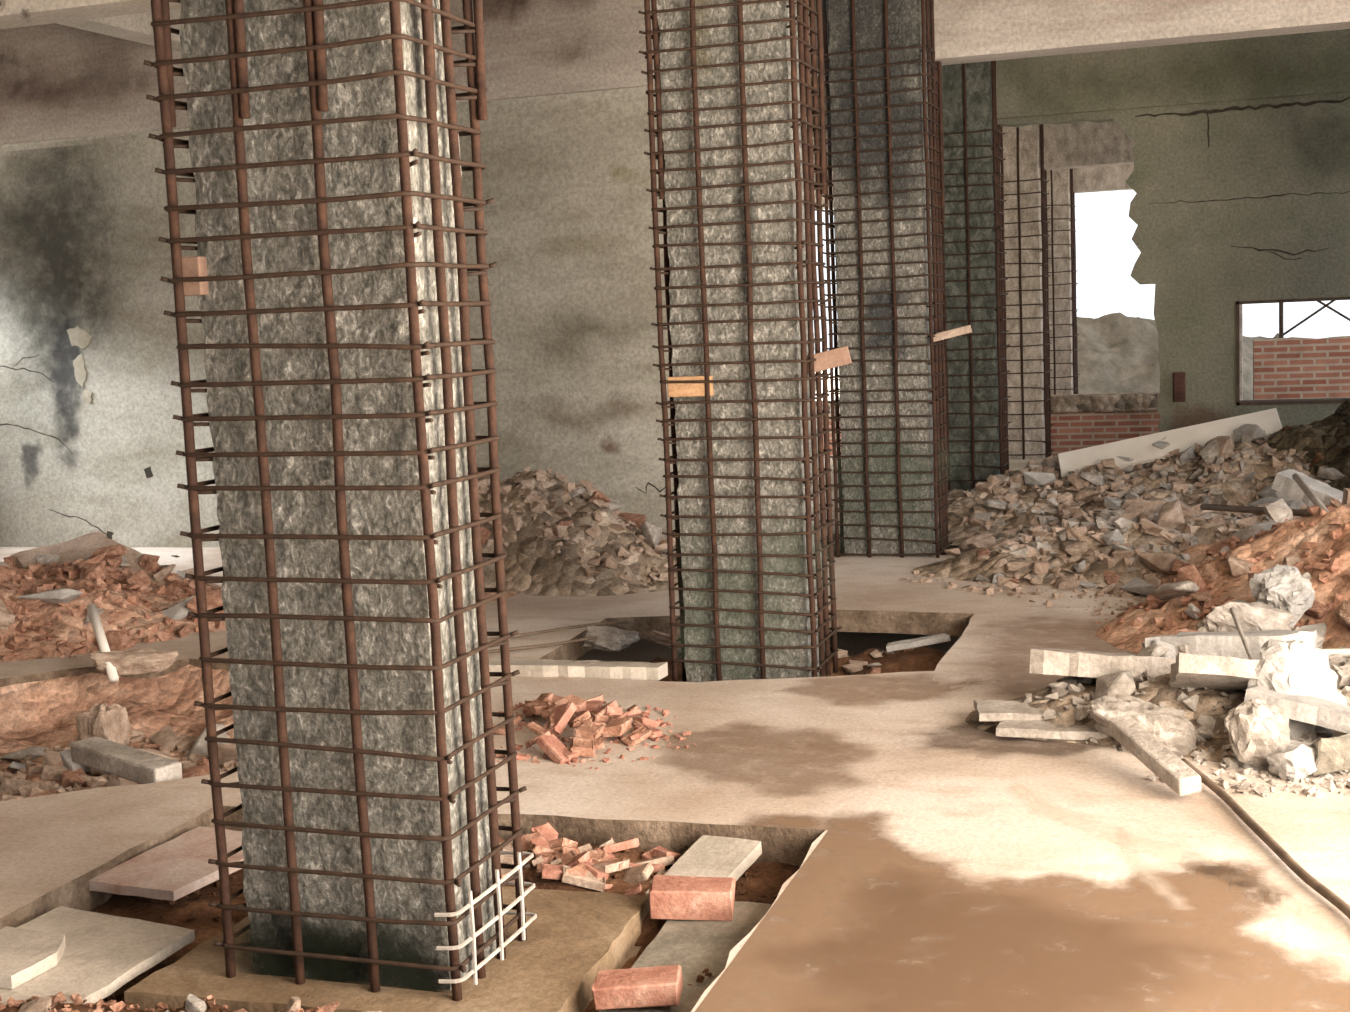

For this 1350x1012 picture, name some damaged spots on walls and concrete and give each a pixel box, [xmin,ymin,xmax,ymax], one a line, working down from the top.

crack [1135,97,1350,147]
crack [1148,191,1350,204]
crack [1233,246,1329,260]
leakage [54,324,78,435]